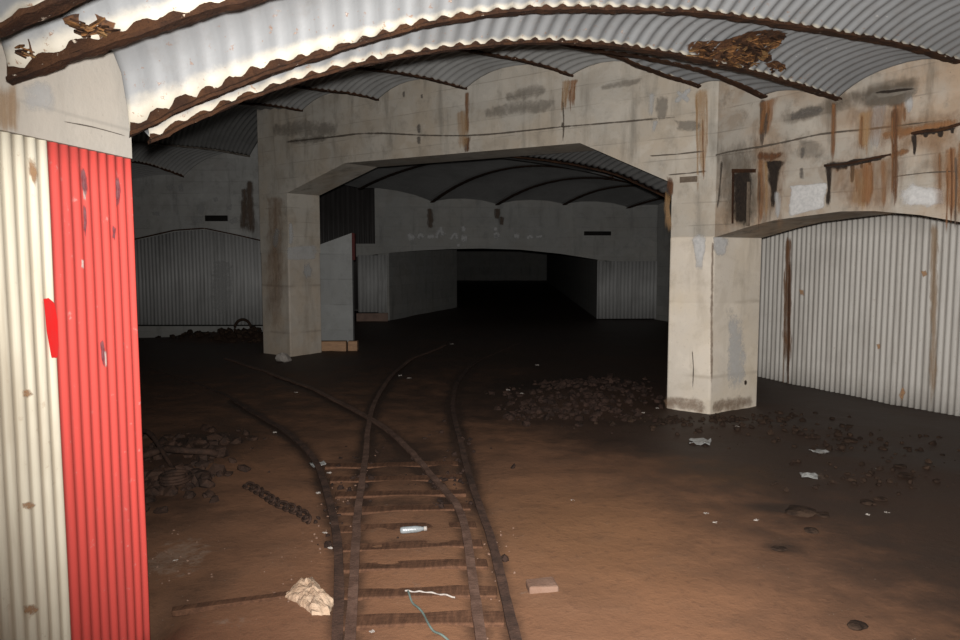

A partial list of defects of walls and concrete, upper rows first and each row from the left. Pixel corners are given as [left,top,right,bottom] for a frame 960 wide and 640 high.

corrosion [14,39,37,59]
corrosion [62,14,121,39]
corrosion [686,29,787,73]
corrosion [561,80,576,109]
corrosion [461,93,469,151]
corrosion [758,99,783,218]
corrosion [855,103,955,204]
corrosion [240,181,255,232]
corrosion [783,238,804,383]